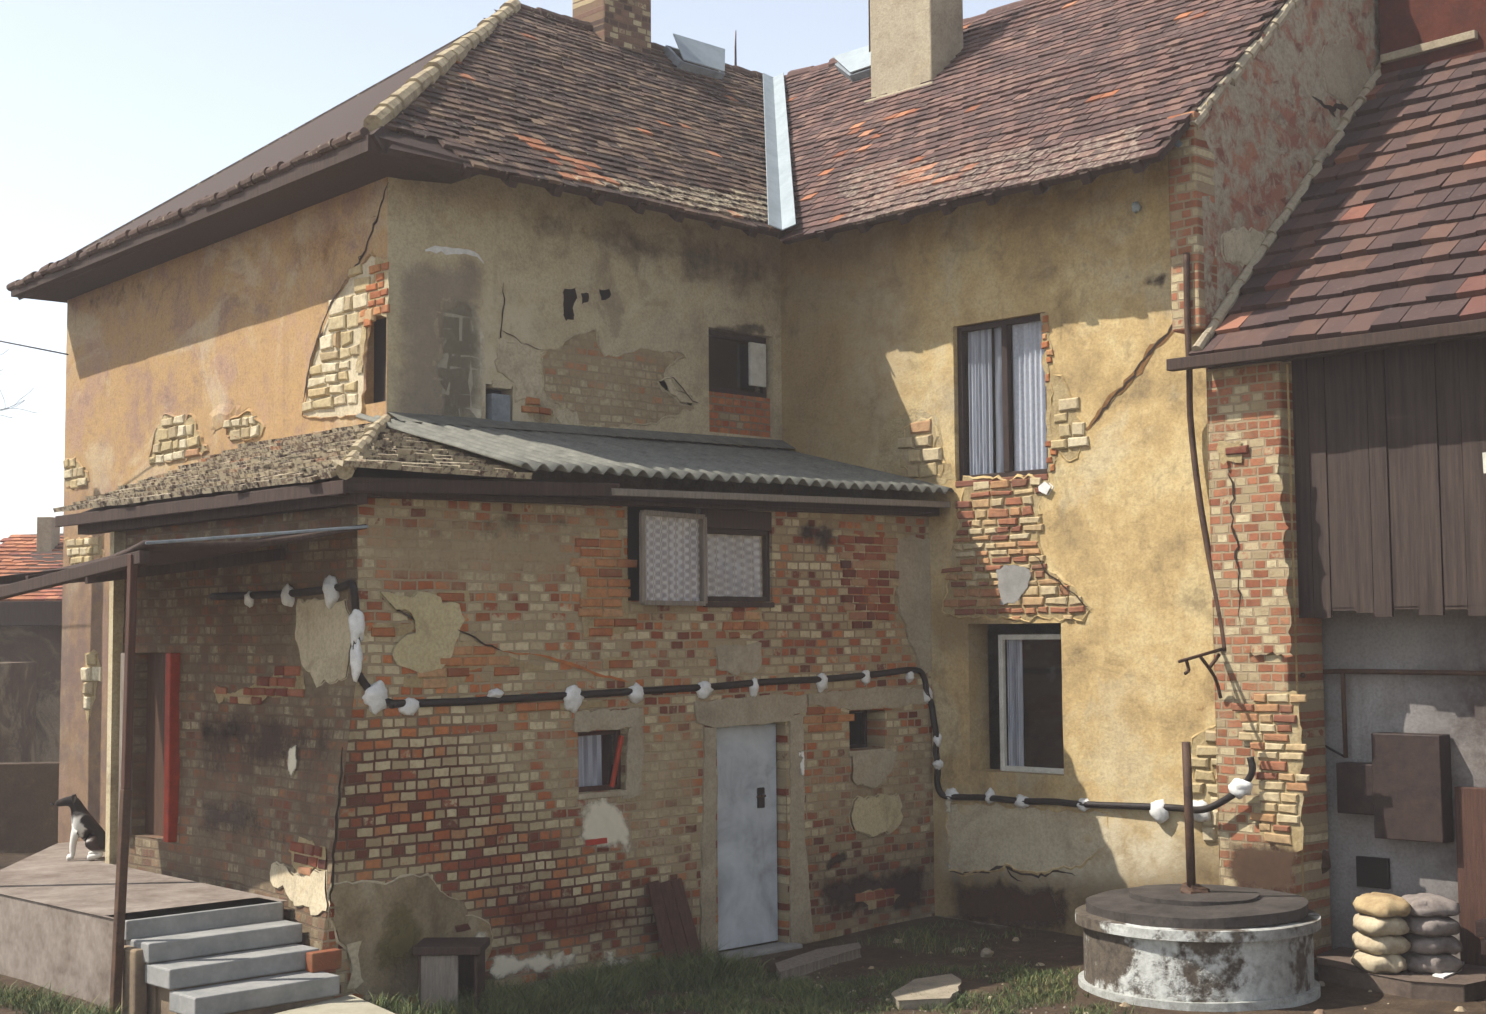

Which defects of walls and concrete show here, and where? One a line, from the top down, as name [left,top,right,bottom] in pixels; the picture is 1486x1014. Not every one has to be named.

crack [342,182,389,286]
spalling [301,253,390,421]
crack [500,283,541,350]
spalling [437,288,698,429]
crack [1081,324,1173,437]
spalling [877,313,1093,623]
crack [1228,466,1242,620]
flaking render [213,590,544,705]
peeling [945,801,1110,877]
spalling [1191,724,1219,843]
spalling [1232,691,1310,852]
water stain [958,879,1067,928]